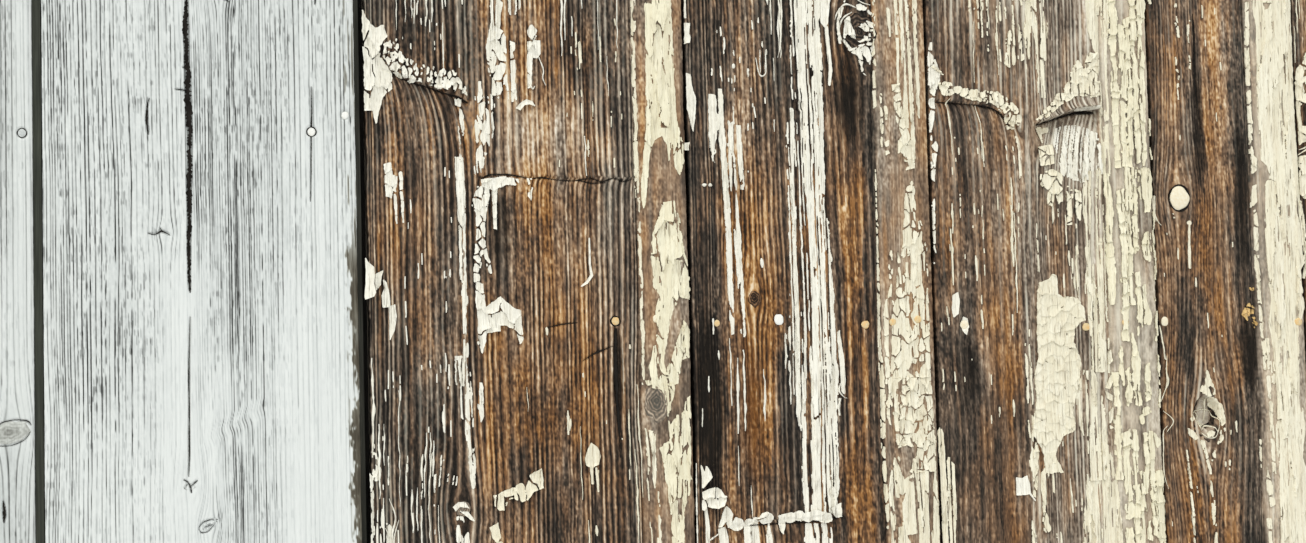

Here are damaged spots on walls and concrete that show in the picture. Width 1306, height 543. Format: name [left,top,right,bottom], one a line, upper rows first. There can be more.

peeling [570,32,582,70]
crack [145,0,193,293]
crack [482,174,631,184]
peeling [362,0,546,543]
peeling [581,238,593,287]
peeling [599,0,1238,543]
peeling [1241,0,1306,543]
crack [184,327,198,493]
peeling [585,443,601,492]